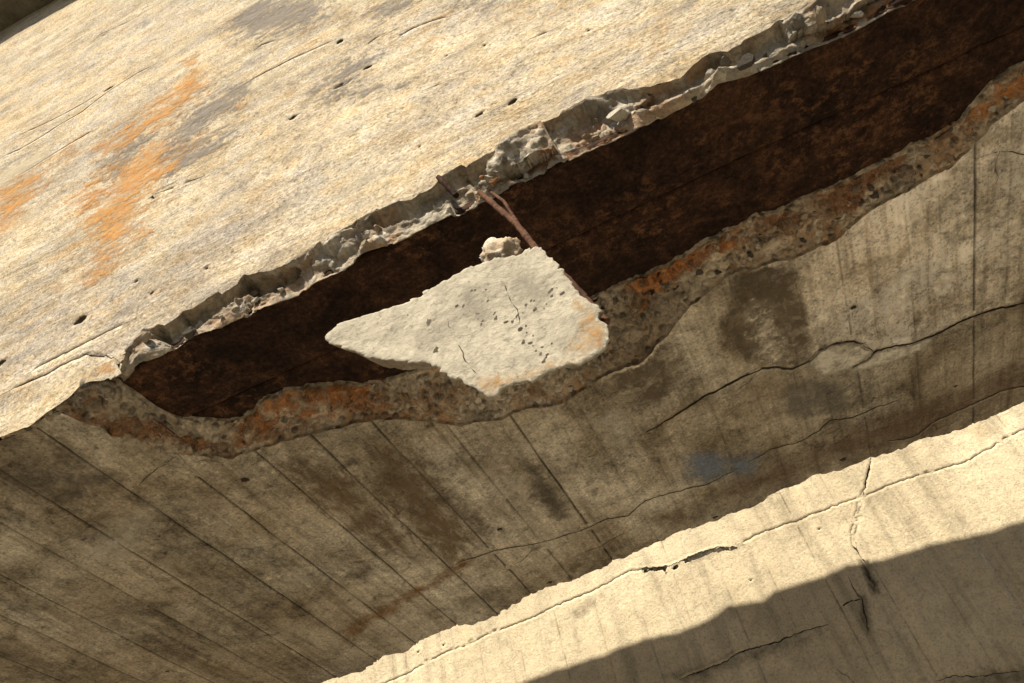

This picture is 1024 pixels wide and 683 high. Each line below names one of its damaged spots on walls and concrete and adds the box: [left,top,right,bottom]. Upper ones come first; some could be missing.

corrosion [0,164,50,230]
corrosion [63,59,206,287]
spalling [0,0,1024,459]
corrosion [528,120,626,174]
corrosion [627,230,738,311]
leakage [720,268,812,365]
corrosion [756,156,905,240]
crack [645,298,1024,433]
crack [376,383,1024,683]